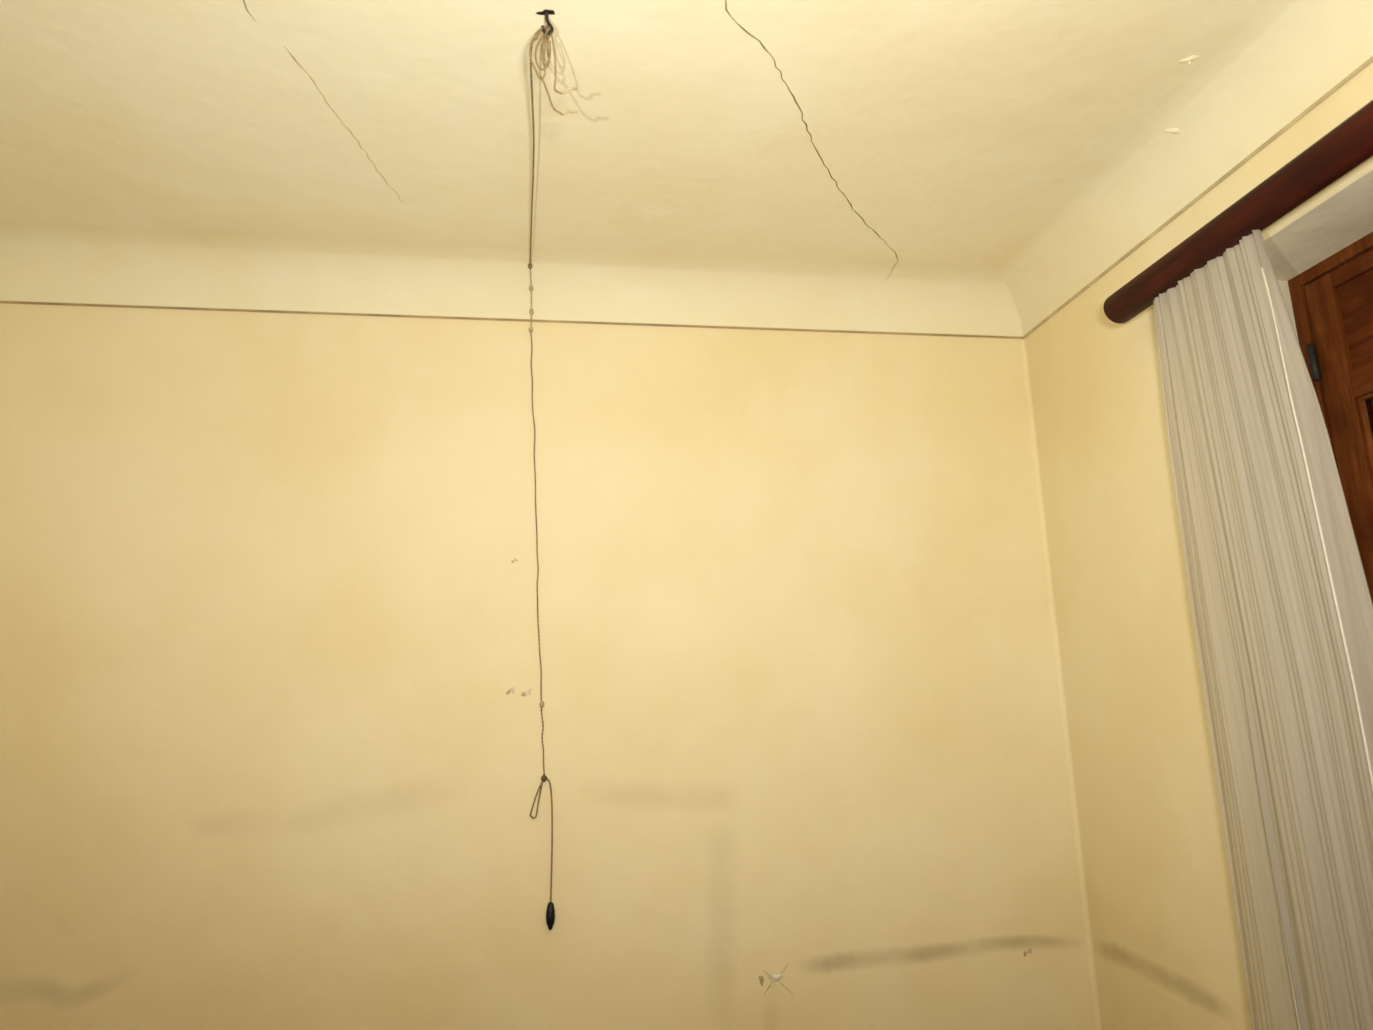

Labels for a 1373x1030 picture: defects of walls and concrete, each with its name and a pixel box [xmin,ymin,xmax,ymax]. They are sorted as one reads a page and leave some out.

crack [284,46,404,203]
crack [725,0,898,282]